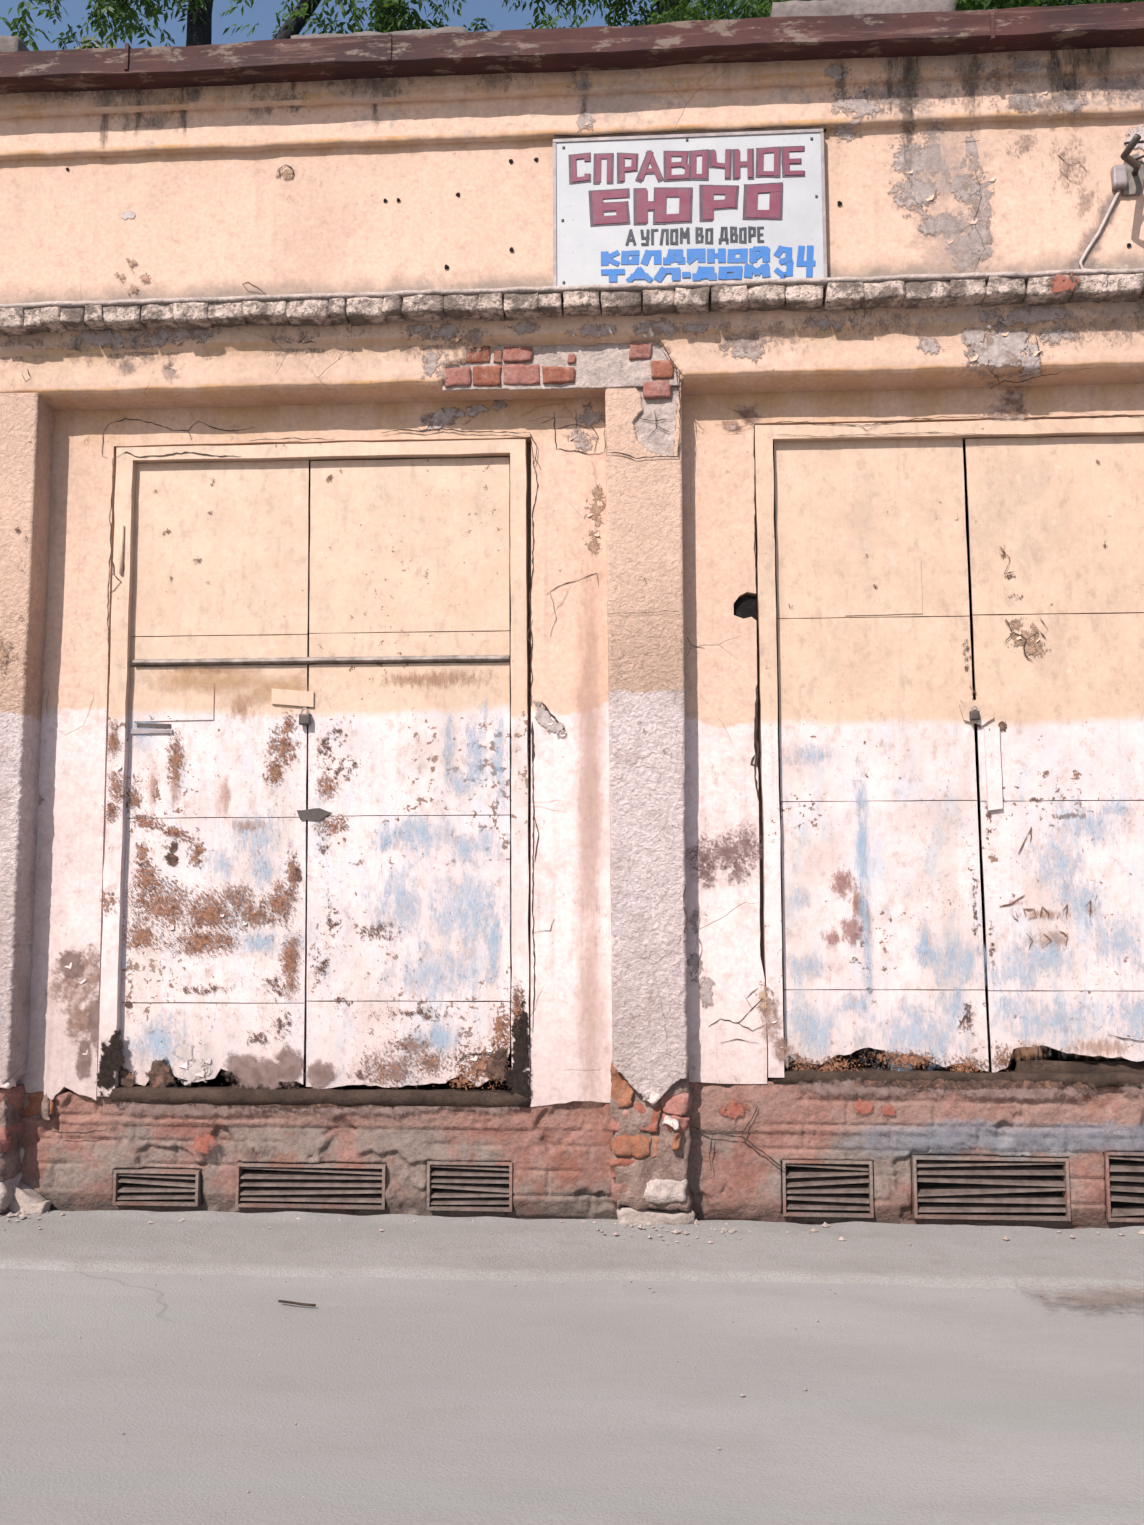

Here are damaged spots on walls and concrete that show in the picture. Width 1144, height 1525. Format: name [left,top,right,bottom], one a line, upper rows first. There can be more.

damp [887,56,919,172]
peeling [822,55,1144,272]
damp [1047,49,1109,114]
peeling [271,327,371,365]
flaking render [401,272,1144,456]
rust [96,691,532,1099]
peeling [175,1040,212,1086]
flaking render [0,1084,55,1213]
flaking render [608,1062,692,1211]